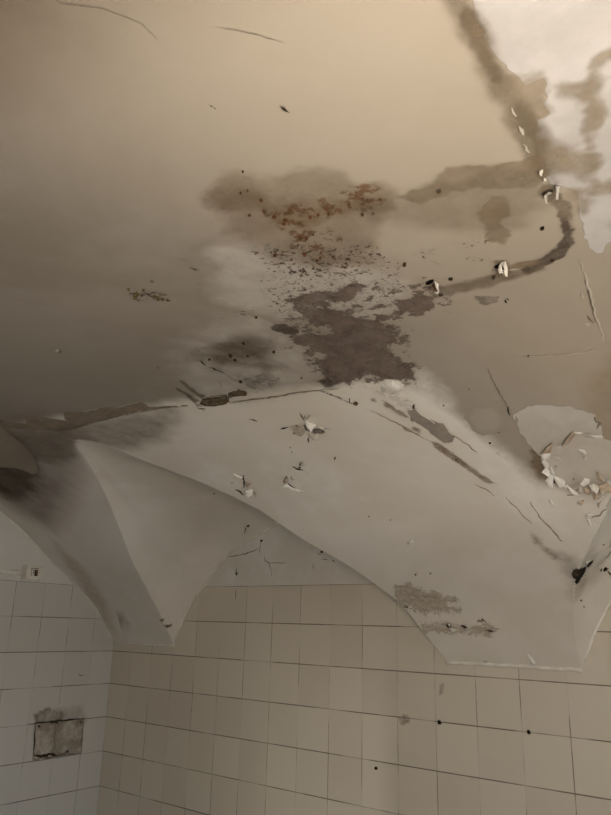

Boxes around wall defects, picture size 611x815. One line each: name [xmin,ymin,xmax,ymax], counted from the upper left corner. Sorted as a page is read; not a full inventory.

damp [462,10,596,176]
mould [252,244,399,293]
damp [434,261,539,305]
damp [208,339,275,363]
peeling [179,412,382,534]
peeling [463,405,611,526]
flaking render [391,582,461,614]
flaking render [422,618,498,637]